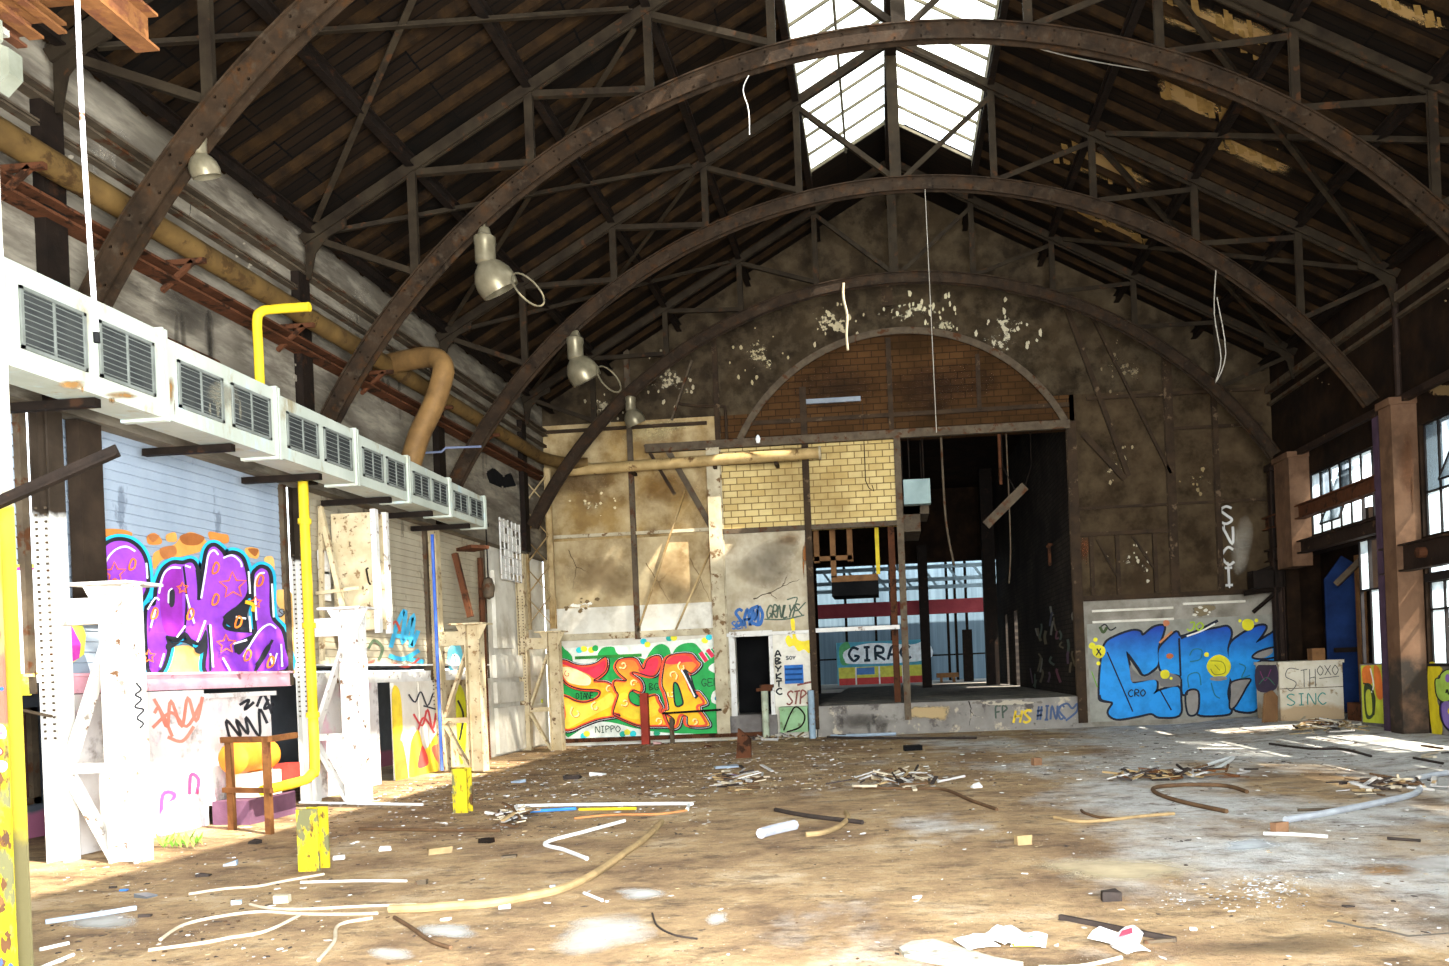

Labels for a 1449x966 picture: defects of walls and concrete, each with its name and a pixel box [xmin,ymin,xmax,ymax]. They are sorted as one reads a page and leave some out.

flaking render [813,302,865,347]
flaking render [883,291,1042,350]